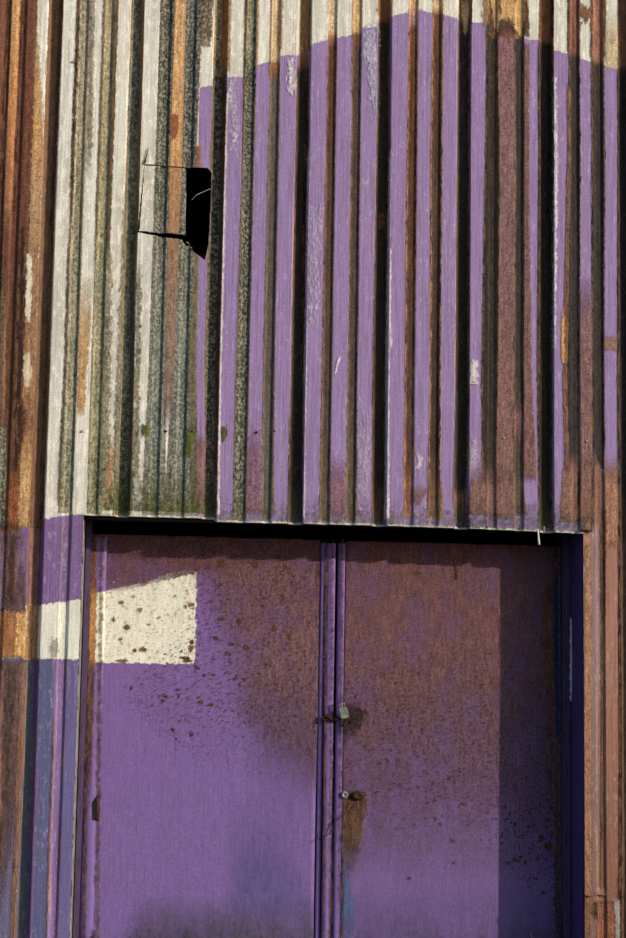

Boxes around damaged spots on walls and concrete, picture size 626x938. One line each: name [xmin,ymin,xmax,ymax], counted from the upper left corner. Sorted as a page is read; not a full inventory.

rust [0,0,64,938]
rust [164,238,179,422]
rust [170,0,187,167]
rust [195,0,232,520]
rust [246,0,284,519]
rust [287,0,311,523]
rust [318,0,363,521]
rust [371,0,391,524]
rust [81,534,562,938]